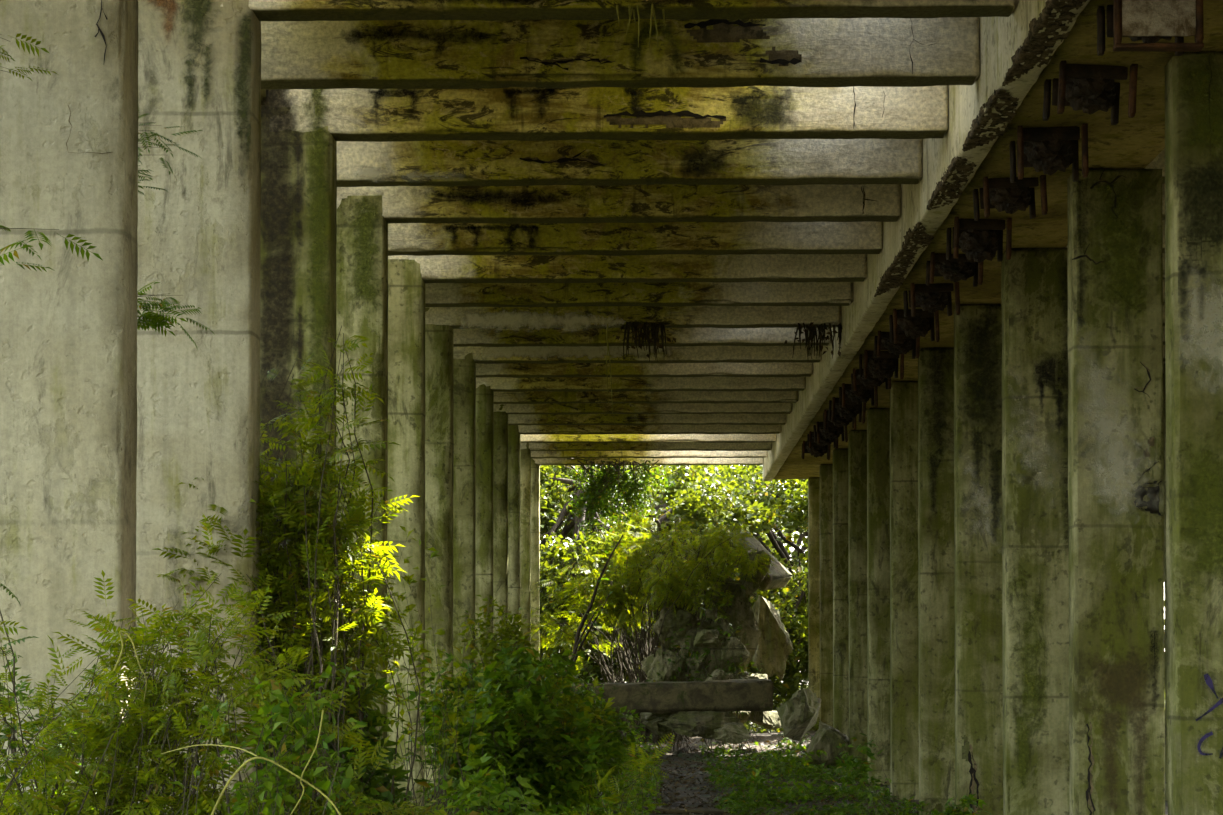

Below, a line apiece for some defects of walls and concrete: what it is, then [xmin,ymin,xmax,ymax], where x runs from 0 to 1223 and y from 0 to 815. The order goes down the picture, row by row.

water stain [343,26,495,58]
water stain [369,89,424,123]
water stain [503,88,557,117]
water stain [732,90,790,126]
spalling [874,0,1087,297]
water stain [403,172,581,206]
water stain [237,89,303,564]
crack [968,744,979,814]
water stain [1016,717,1030,787]
crack [1086,722,1096,815]
water stain [1093,631,1160,815]